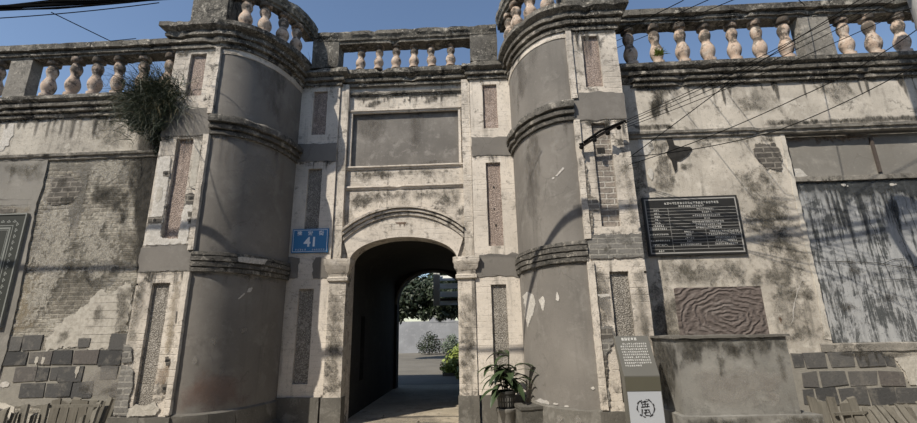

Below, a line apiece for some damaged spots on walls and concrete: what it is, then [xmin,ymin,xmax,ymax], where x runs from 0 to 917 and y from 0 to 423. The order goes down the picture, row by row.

leakage [635,81,787,130]
leakage [763,115,917,140]
leakage [799,76,917,97]
leakage [655,140,677,188]
flaking render [753,142,807,177]
leakage [0,116,203,318]
leakage [796,178,917,247]
flaking render [0,160,135,420]
peeling [522,292,545,326]
leakage [639,175,810,406]